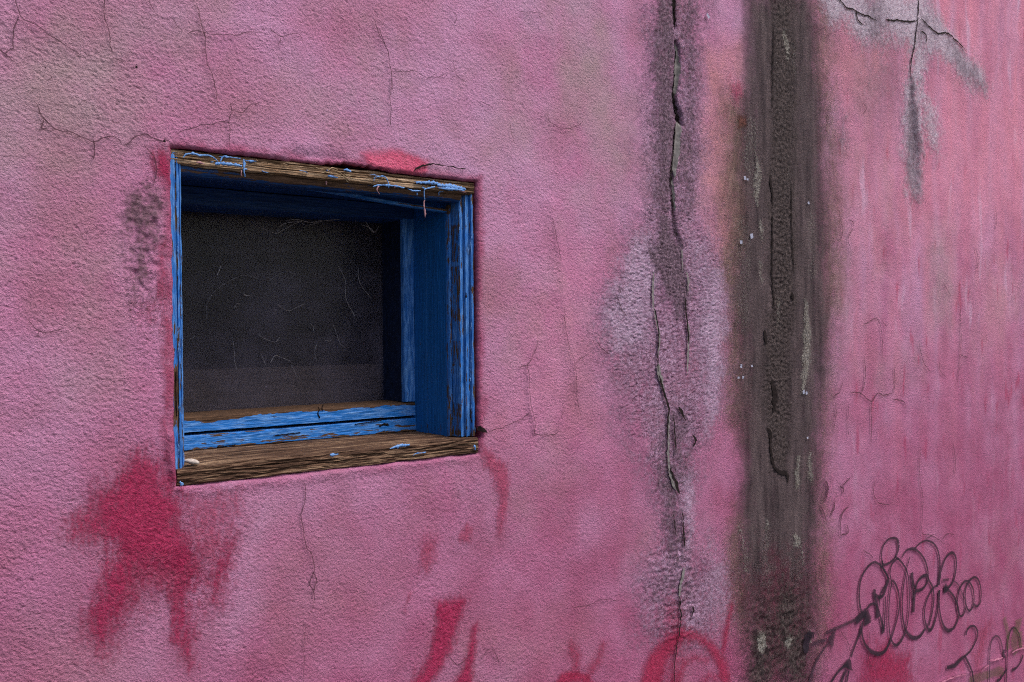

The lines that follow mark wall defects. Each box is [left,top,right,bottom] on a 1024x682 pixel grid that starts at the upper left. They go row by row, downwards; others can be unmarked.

crack [36,0,302,182]
crack [375,22,466,124]
crack [840,0,967,76]
crack [414,163,465,171]
water stain [121,185,165,280]
crack [652,0,697,682]
water stain [722,0,837,682]